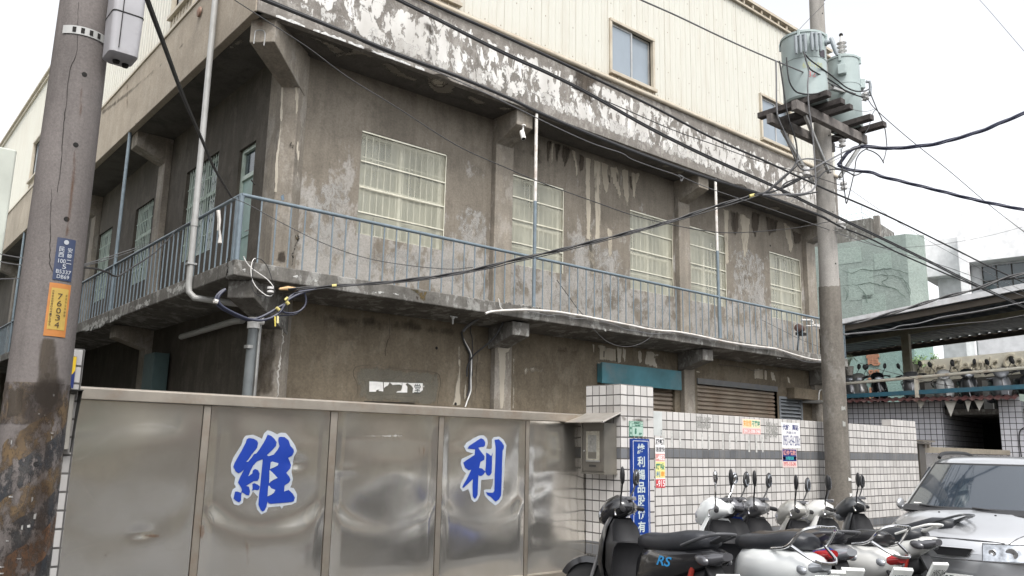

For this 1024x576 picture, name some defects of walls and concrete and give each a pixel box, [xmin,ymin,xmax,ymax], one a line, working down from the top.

crack [49,2,79,271]
peeling [276,0,816,208]
water stain [537,141,640,274]
water stain [38,338,57,385]
crack [276,323,284,396]